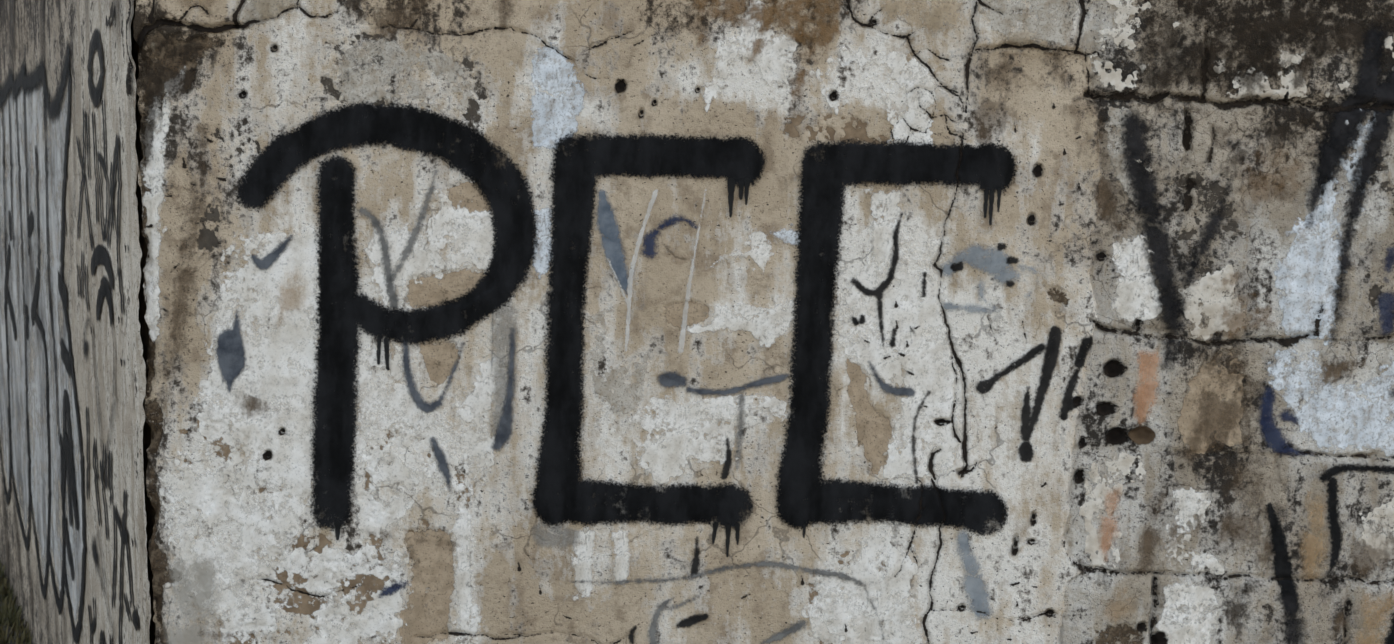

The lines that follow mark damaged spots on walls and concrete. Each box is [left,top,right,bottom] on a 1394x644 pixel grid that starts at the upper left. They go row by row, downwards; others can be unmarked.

crack [381,11,682,79]
peeling [980,0,1152,205]
peeling [1213,50,1307,101]
damp [1140,0,1394,89]
crack [846,0,1099,644]
spalling [1104,360,1128,377]
peeling [1096,235,1162,332]
peeling [1166,169,1252,341]
spalling [1177,352,1244,455]
peeling [1267,109,1394,457]
peeling [1074,396,1155,575]
peeling [1096,487,1225,644]